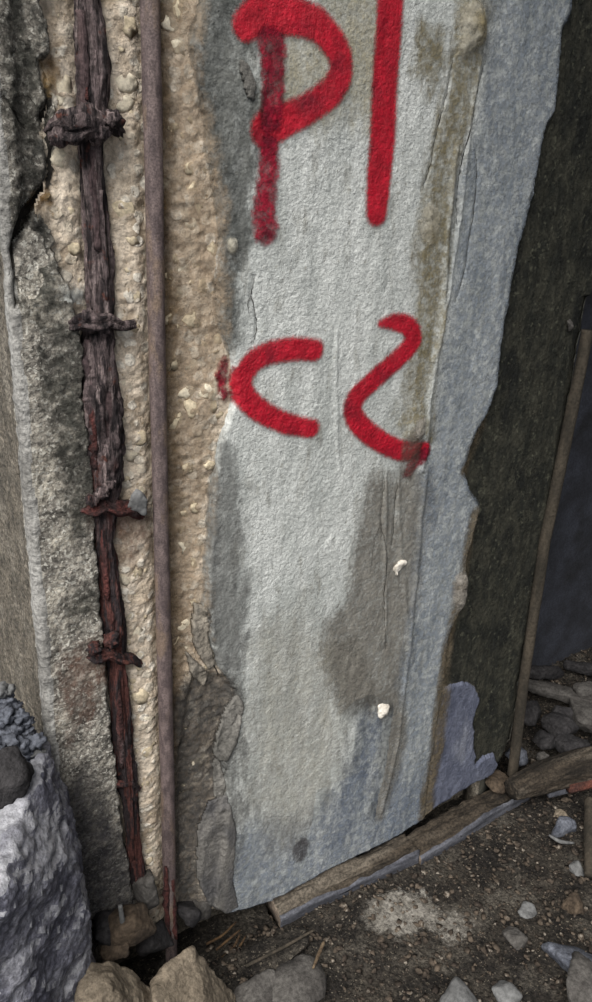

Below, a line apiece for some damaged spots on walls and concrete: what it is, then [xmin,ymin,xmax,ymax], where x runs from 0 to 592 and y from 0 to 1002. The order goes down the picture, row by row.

crack [4,63,54,269]
spalling [12,0,86,315]
corrosion [75,10,90,103]
corrosion [88,150,110,300]
corrosion [85,391,116,470]
spalling [101,0,164,923]
spalling [161,0,244,914]
water stain [171,0,592,912]